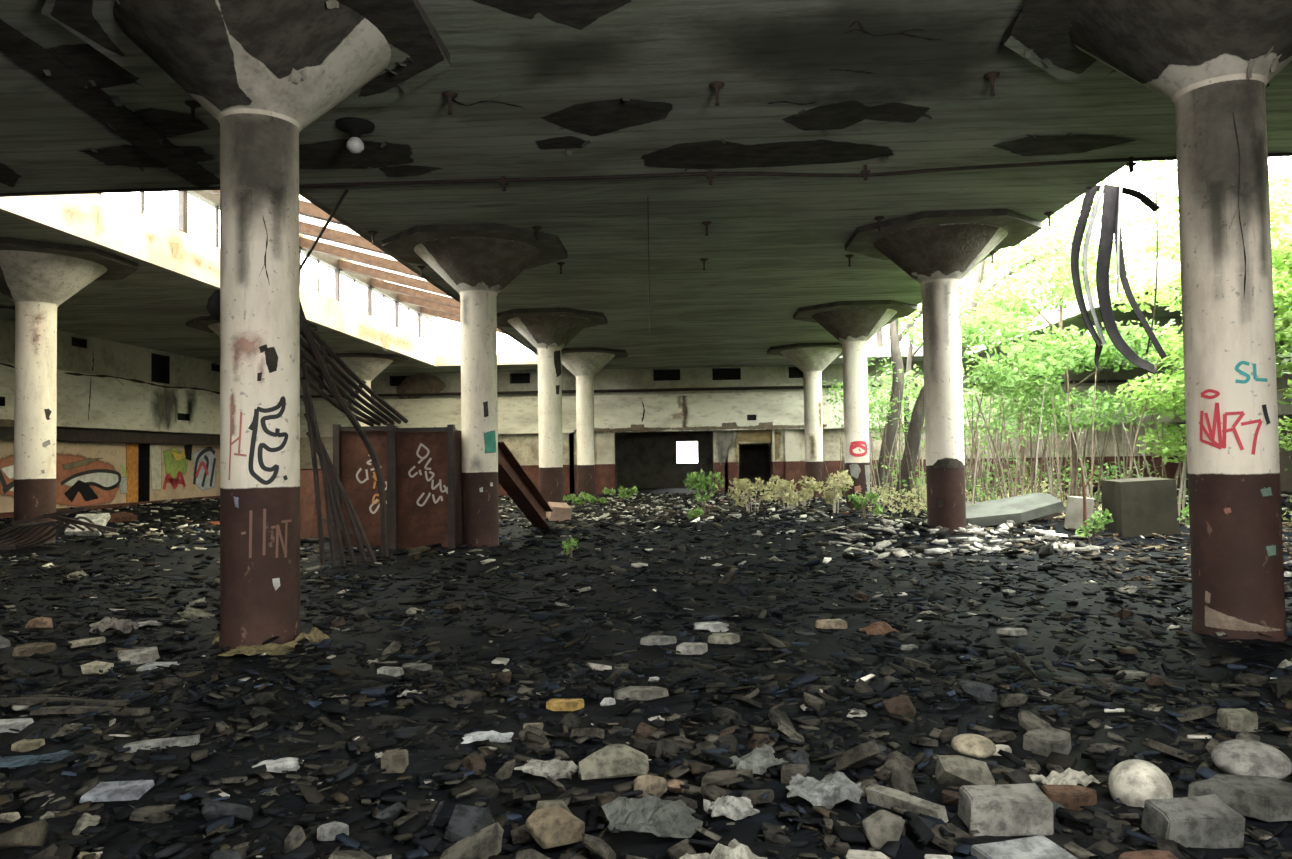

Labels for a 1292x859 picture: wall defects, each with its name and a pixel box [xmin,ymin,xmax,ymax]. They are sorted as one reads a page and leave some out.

peeling [474,0,631,29]
peeling [1011,0,1292,84]
peeling [0,0,444,187]
damp [226,113,294,280]
peeling [535,98,672,155]
peeling [641,100,932,172]
damp [1189,79,1266,266]